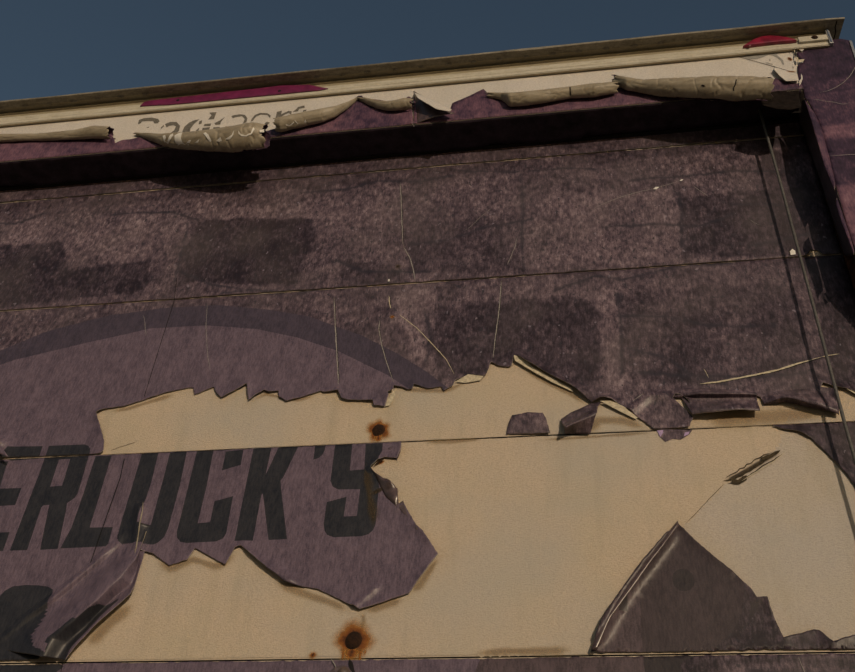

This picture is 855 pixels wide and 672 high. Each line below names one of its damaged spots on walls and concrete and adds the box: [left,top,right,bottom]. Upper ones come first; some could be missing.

peeling [0,49,804,149]
peeling [40,359,855,662]
rust [337,622,372,660]